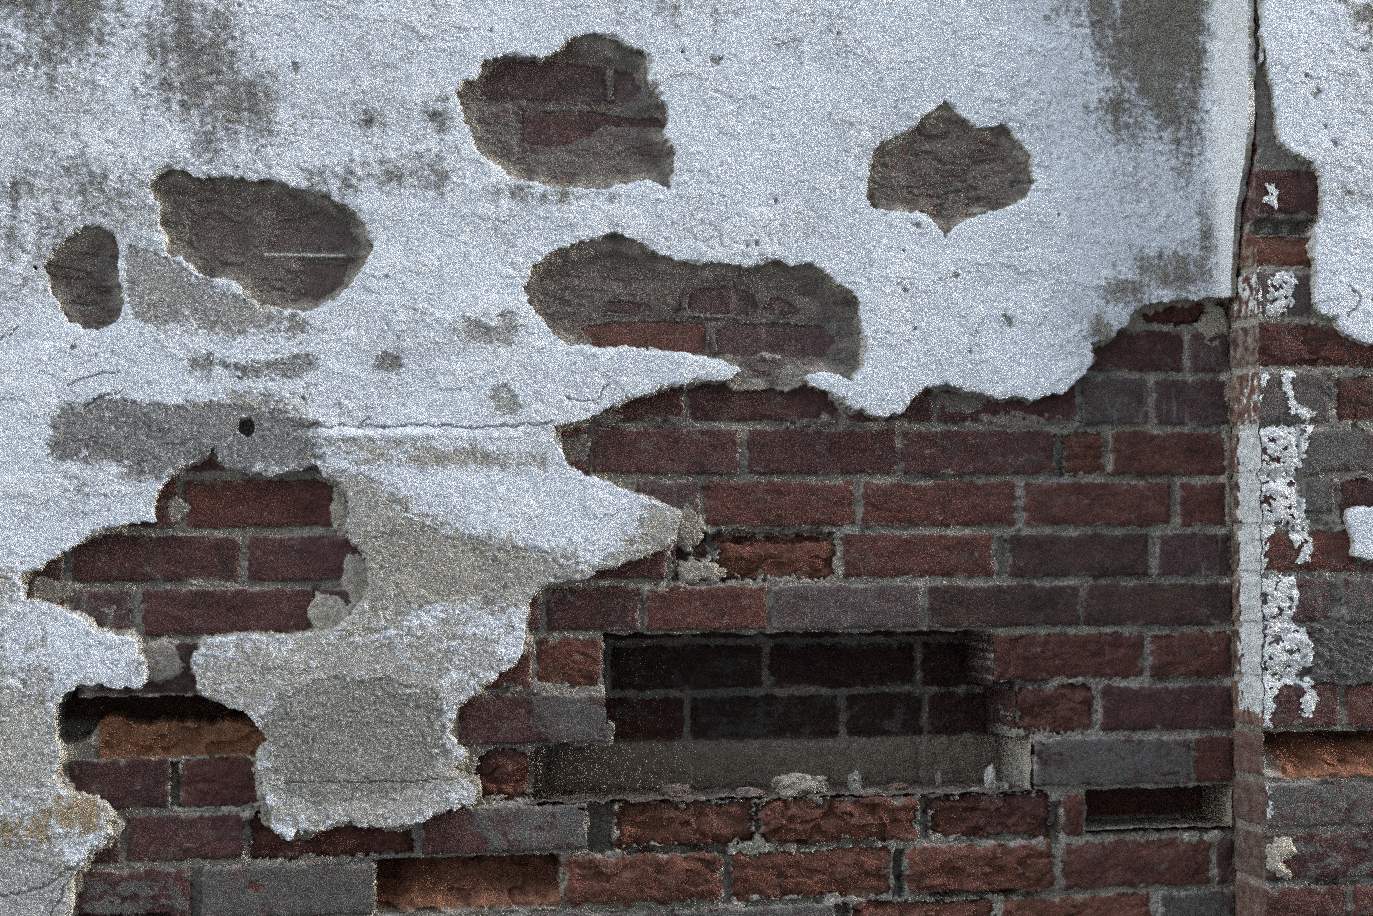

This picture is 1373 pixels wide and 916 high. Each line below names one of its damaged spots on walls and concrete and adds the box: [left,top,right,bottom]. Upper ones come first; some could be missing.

flaking render [35,169,373,382]
crack [294,382,611,431]
flaking render [456,32,677,190]
flaking render [866,102,1036,238]
leakage [1091,318,1112,340]
leakage [1051,0,1212,305]
peeling [1077,47,1373,828]
spalling [0,232,1232,916]